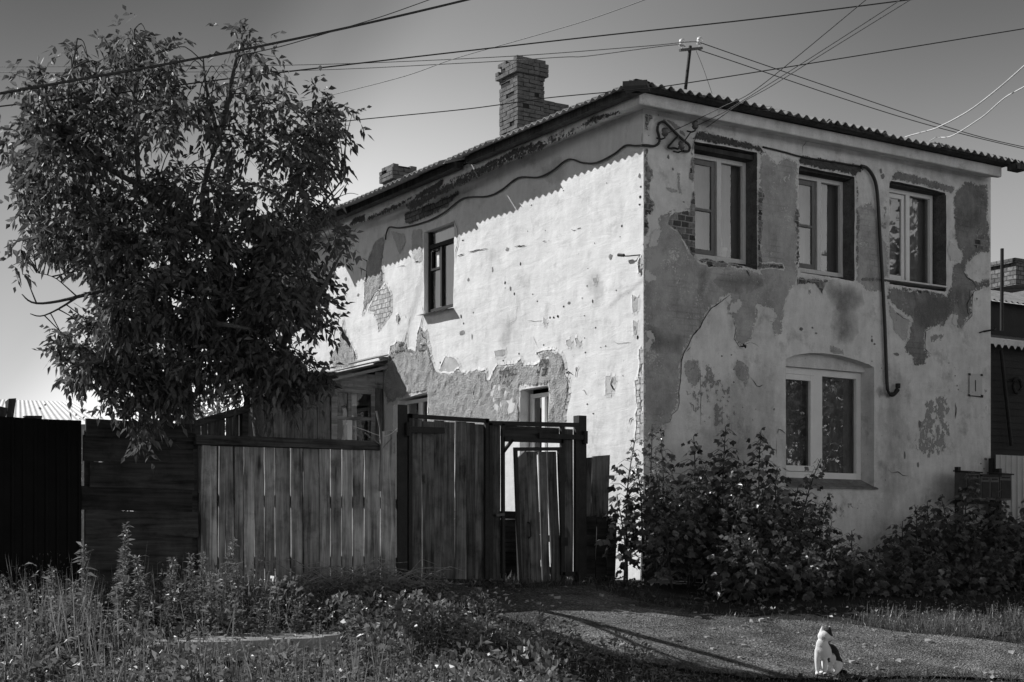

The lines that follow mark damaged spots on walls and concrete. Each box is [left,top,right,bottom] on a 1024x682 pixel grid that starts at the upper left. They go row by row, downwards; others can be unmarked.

peeling [349,111,620,439]
peeling [604,111,831,446]
peeling [854,167,990,370]
peeling [904,397,950,467]